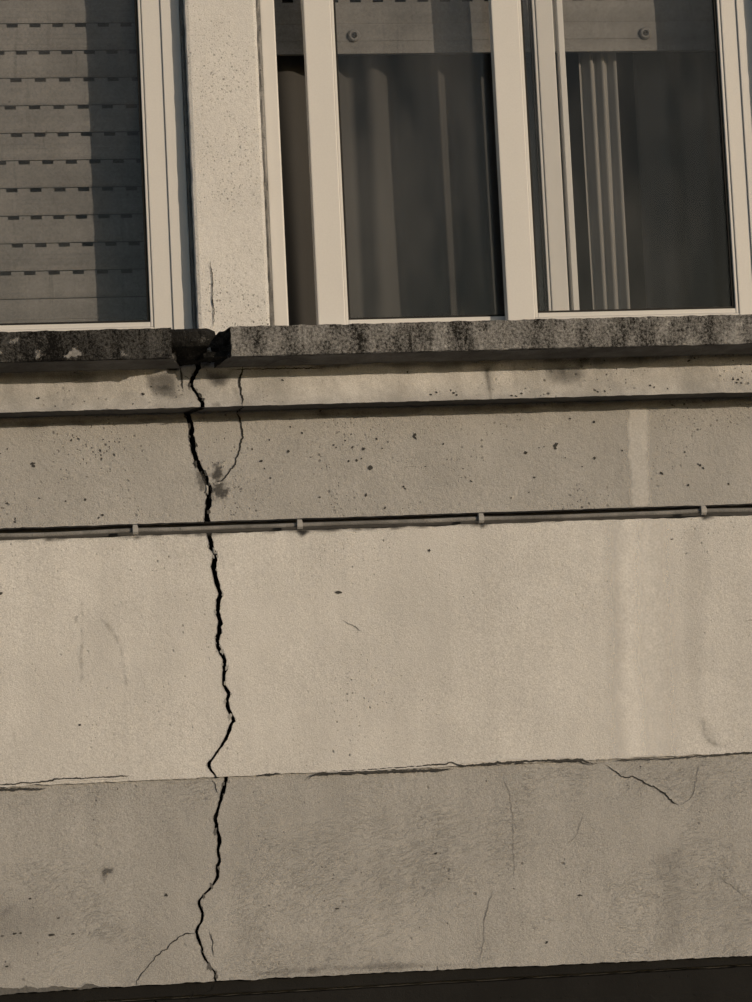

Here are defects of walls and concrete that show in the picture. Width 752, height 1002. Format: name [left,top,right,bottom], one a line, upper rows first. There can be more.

crack [136,358,322,1002]
crack [608,766,699,805]
peeling [0,982,107,995]